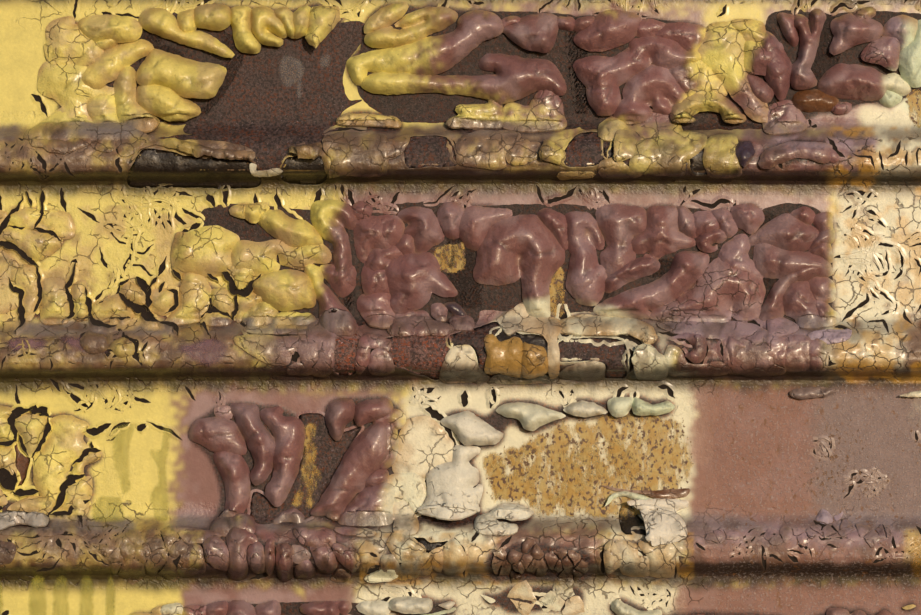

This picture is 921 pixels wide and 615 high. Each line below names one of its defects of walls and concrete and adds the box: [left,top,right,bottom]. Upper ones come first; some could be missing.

peeling [29,21,847,192]
crack [834,140,921,334]
peeling [99,302,852,615]
rust [484,413,693,520]
crack [693,509,921,571]
peeling [763,518,893,548]
peeling [841,467,891,501]